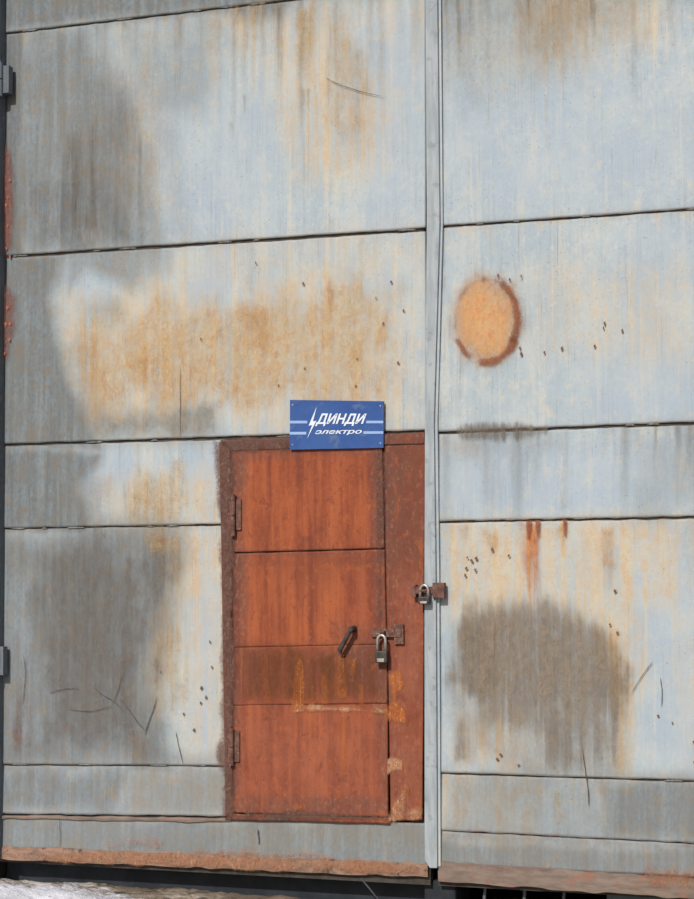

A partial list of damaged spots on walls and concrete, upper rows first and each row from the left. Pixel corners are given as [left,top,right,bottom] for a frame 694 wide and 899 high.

rust [456,273,523,365]
rust [526,520,540,571]
rust [385,672,405,723]
leakage [452,600,628,749]
rust [41,841,417,873]